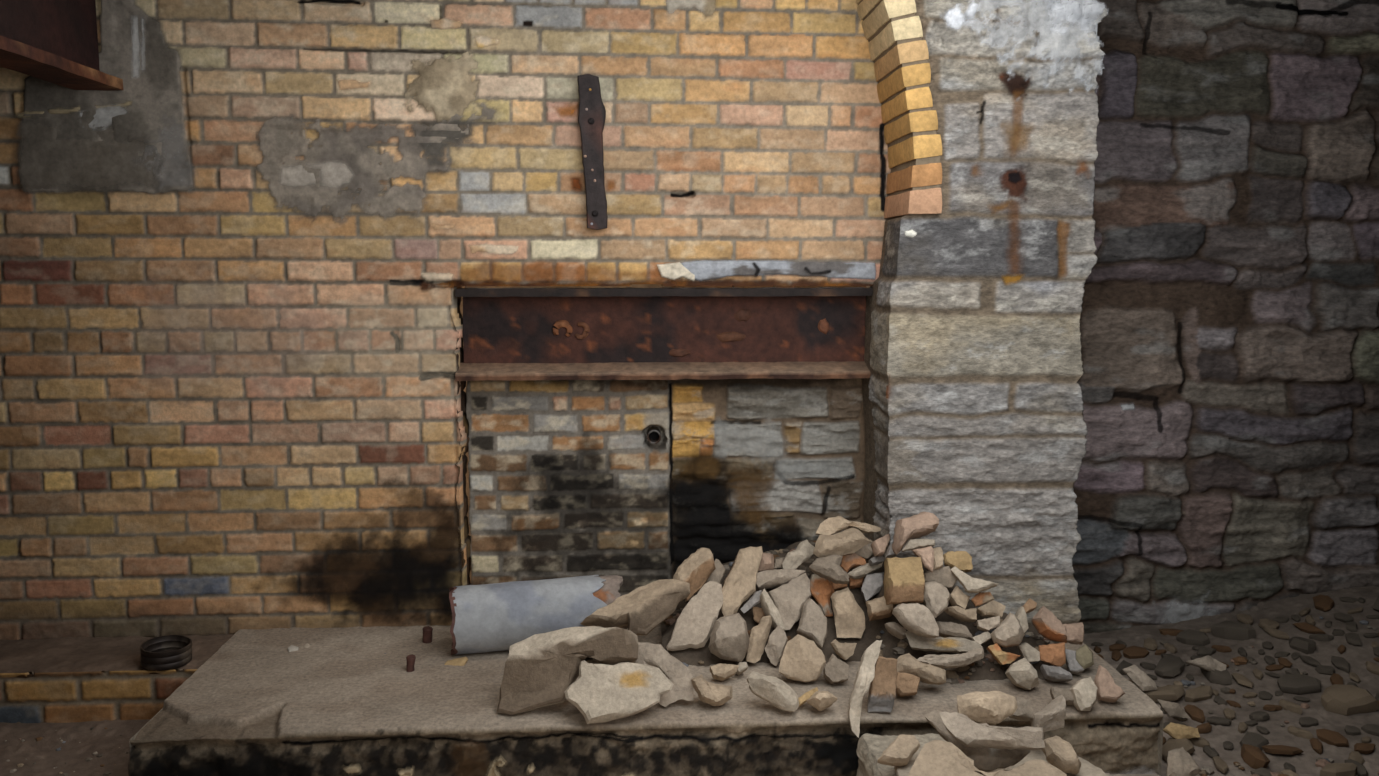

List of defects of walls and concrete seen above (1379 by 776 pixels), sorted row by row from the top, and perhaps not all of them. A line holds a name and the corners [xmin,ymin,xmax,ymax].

corrosion [999,71,1031,97]
corrosion [993,169,1027,284]
corrosion [421,279,873,290]
corrosion [552,320,590,339]
corrosion [818,318,829,334]
damp [664,454,818,566]